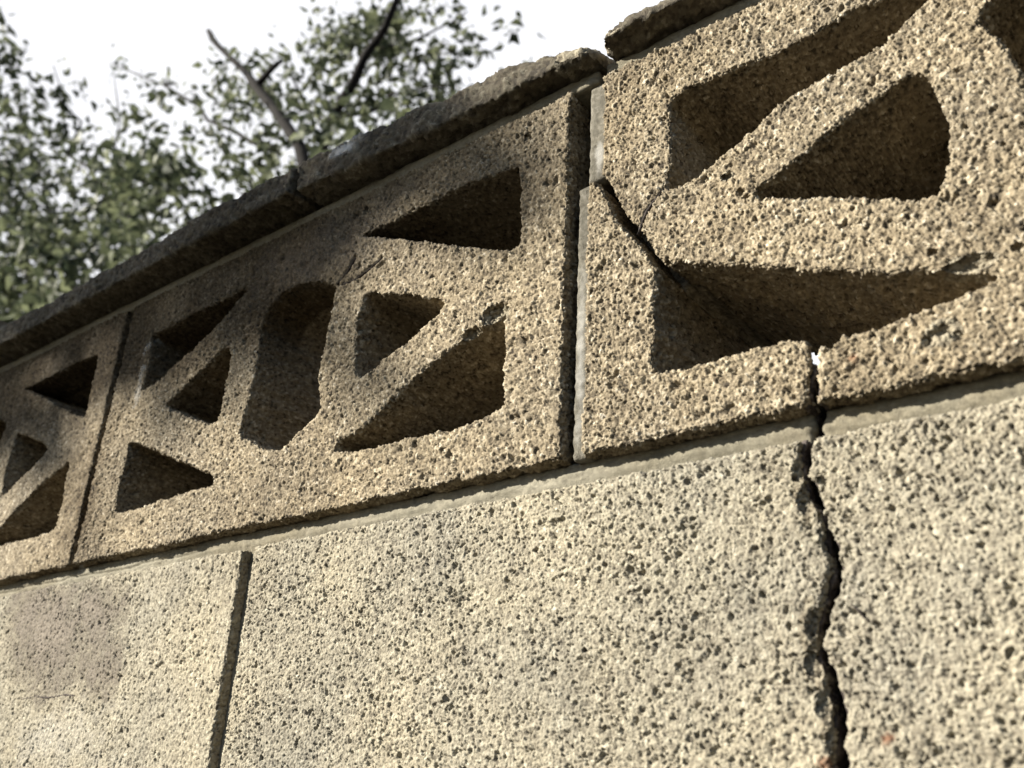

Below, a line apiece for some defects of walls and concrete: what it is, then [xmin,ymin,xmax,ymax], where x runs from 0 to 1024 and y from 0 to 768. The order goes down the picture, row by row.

crack [637,189,772,349]
crack [800,364,852,768]